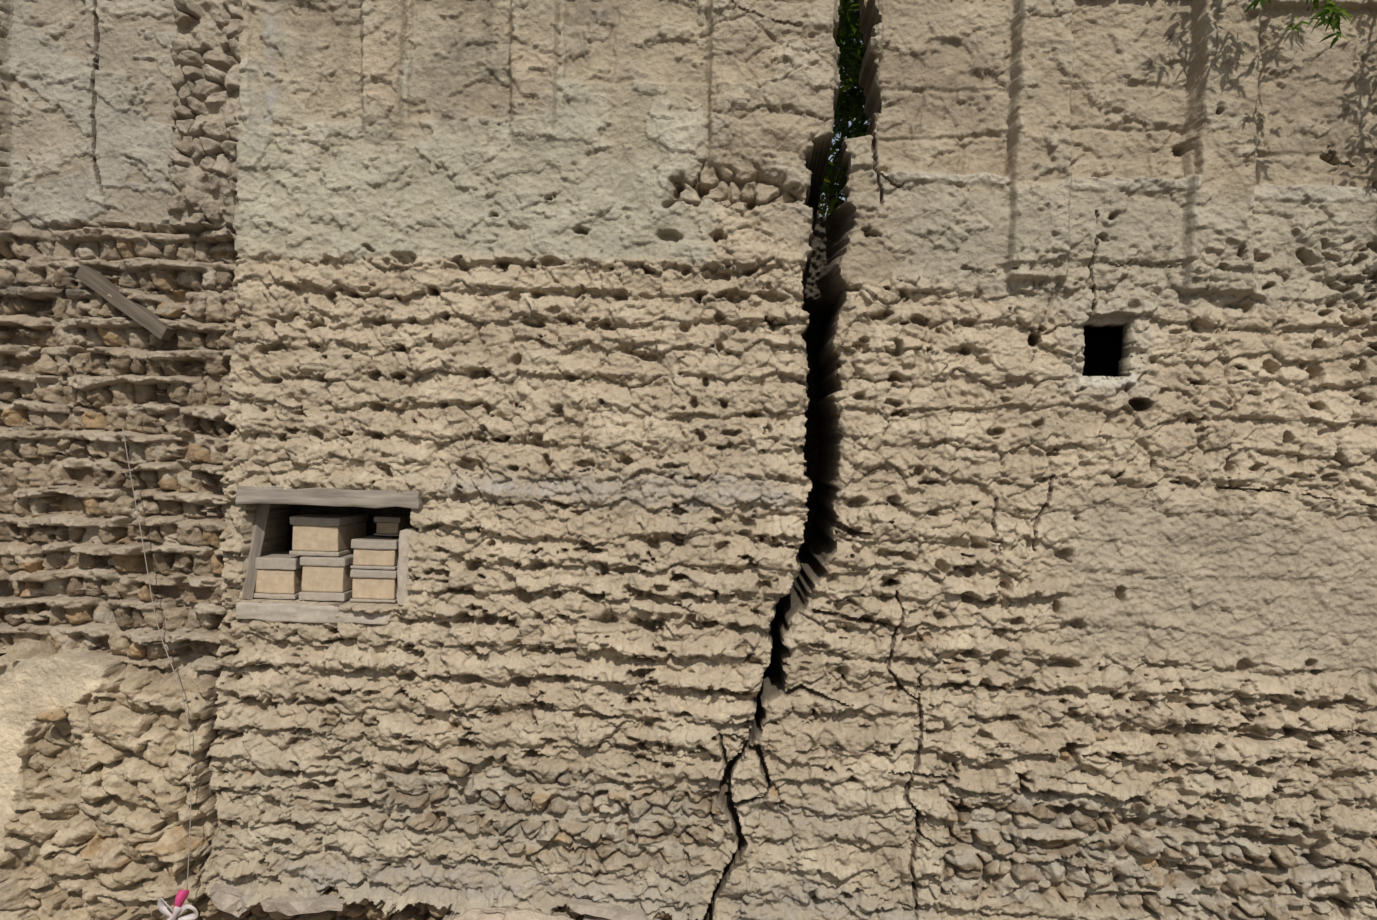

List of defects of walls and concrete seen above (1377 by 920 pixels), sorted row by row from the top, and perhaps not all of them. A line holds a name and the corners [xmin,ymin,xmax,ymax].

crack [89,0,165,194]
crack [702,0,961,920]
crack [1169,469,1377,508]
spalling [0,220,449,920]
crack [1275,728,1377,742]
spalling [569,897,706,920]
crack [1334,835,1377,920]